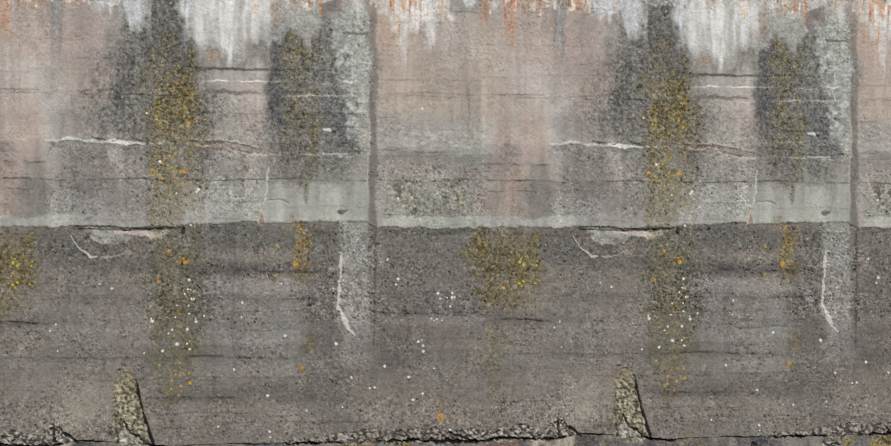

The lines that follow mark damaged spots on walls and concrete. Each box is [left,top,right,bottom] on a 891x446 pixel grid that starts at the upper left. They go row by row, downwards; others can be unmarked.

rust [860,0,891,103]
damp [9,0,503,206]
damp [515,0,891,207]
crack [0,438,112,446]
spalling [111,366,155,446]
crack [142,433,612,446]
spalling [611,362,653,444]
crack [640,430,891,442]